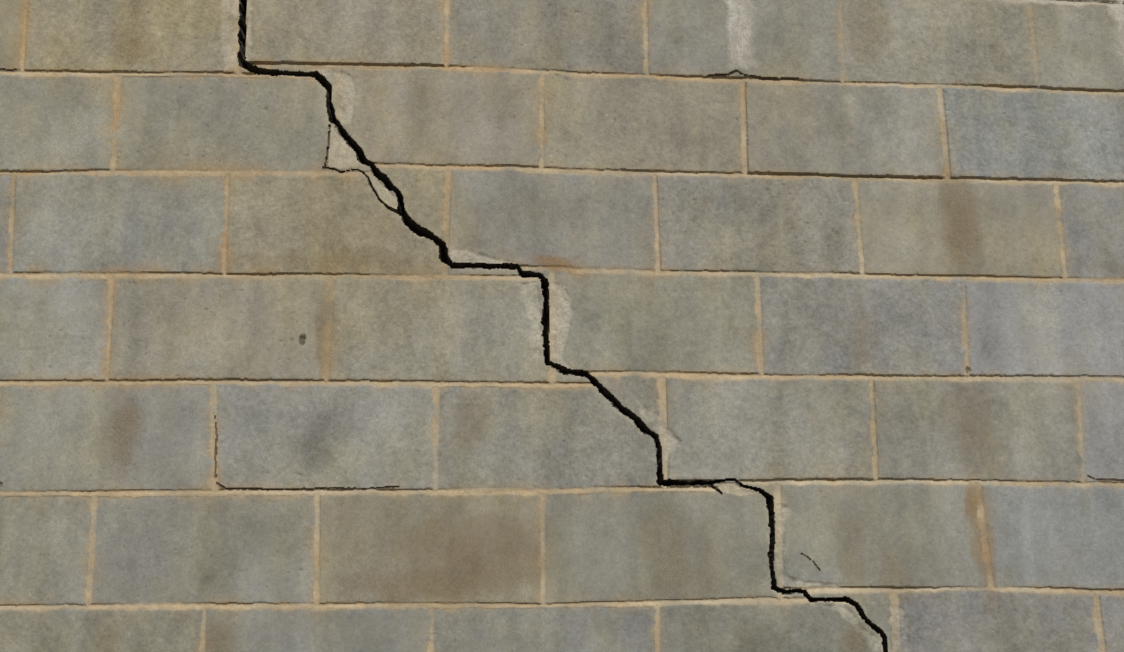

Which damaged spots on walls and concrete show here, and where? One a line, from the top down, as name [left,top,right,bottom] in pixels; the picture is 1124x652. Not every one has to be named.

crack [214,0,888,652]